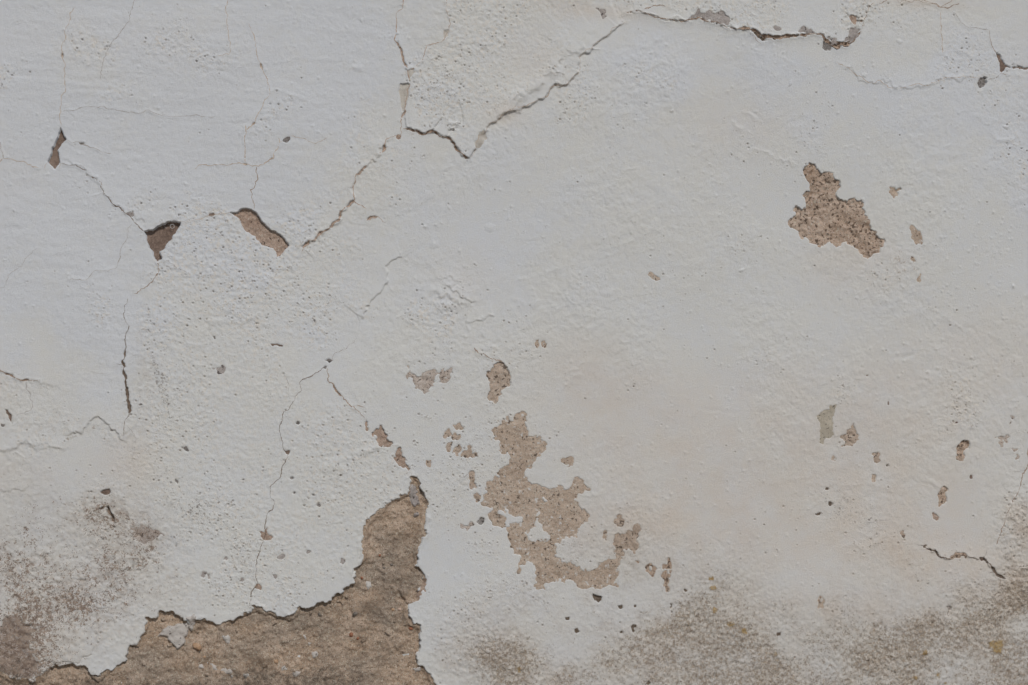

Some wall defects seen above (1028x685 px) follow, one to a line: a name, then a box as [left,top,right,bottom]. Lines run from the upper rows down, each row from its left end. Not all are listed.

crack [0,8,202,280]
spalling [145,222,180,261]
spalling [232,209,288,257]
crack [302,0,1008,251]
peeling [788,163,885,259]
crack [102,262,186,460]
leakage [0,496,160,682]
flaking render [0,422,436,685]
crack [249,340,365,606]
peeling [460,411,672,609]
leakage [451,564,1028,685]
crack [917,450,1028,579]